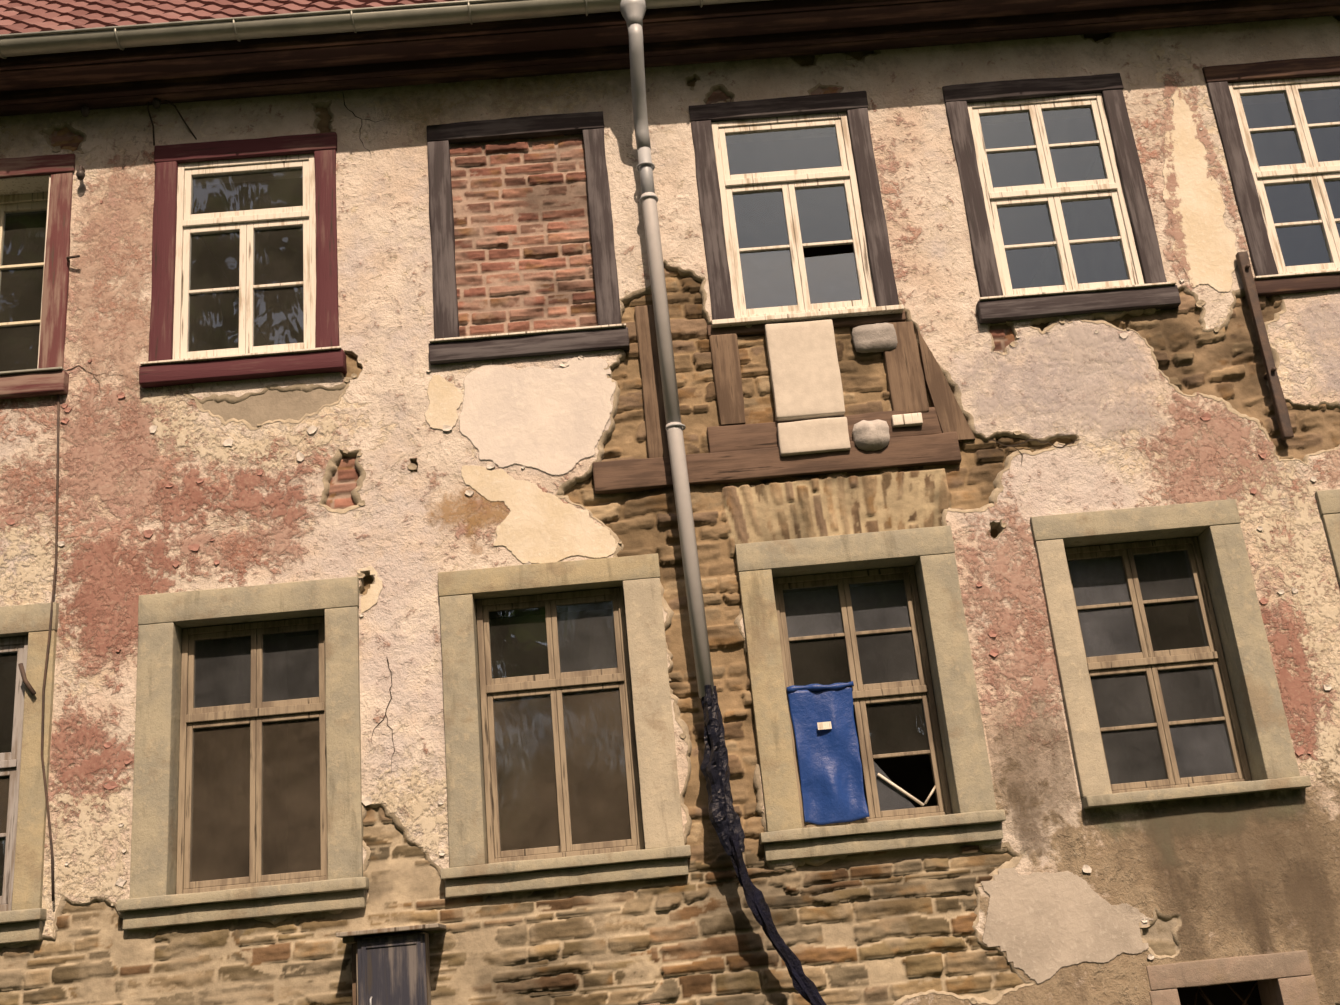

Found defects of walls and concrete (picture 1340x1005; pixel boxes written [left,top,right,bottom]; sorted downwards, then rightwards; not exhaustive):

peeling [0,152,366,673]
crack [371,656,395,773]
flaking render [0,260,1080,1005]
flaking render [1139,907,1183,960]
flaking render [988,58,1340,805]